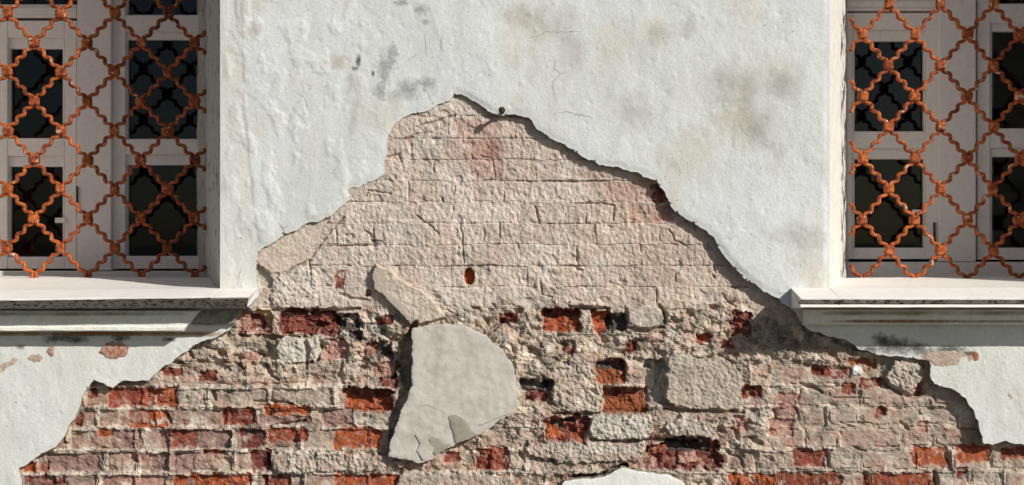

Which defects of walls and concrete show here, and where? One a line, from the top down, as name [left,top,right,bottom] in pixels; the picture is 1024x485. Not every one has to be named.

peeling [0,346,54,373]
flaking render [19,93,1024,485]